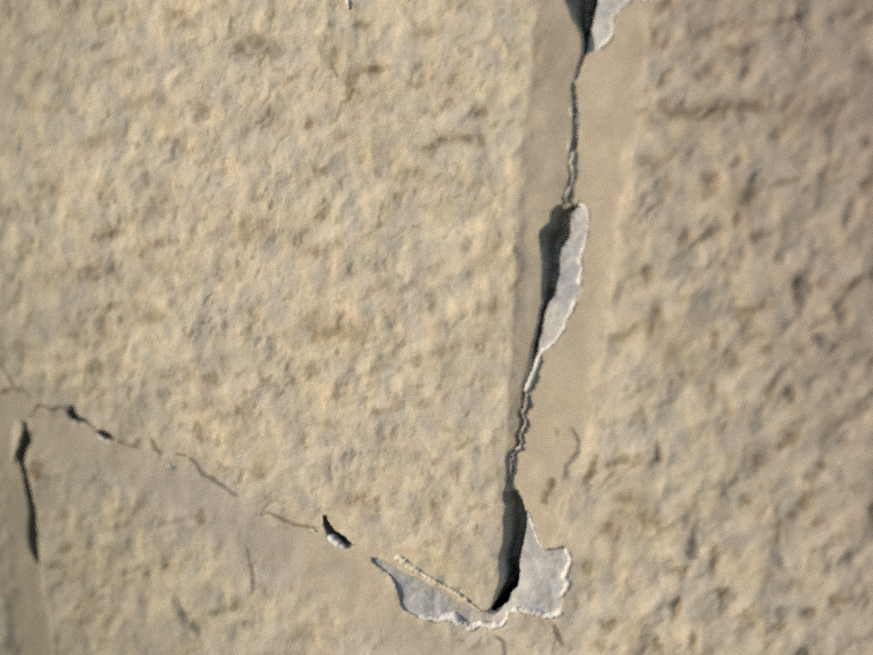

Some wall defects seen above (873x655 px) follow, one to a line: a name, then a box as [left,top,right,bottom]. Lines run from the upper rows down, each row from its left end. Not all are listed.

spalling [566,0,648,83]
crack [562,82,580,208]
spalling [522,201,591,393]
crack [0,365,69,564]
crack [159,451,233,494]
crack [505,388,530,491]
crack [564,429,580,476]
spalling [310,515,353,549]
spalling [372,484,573,632]